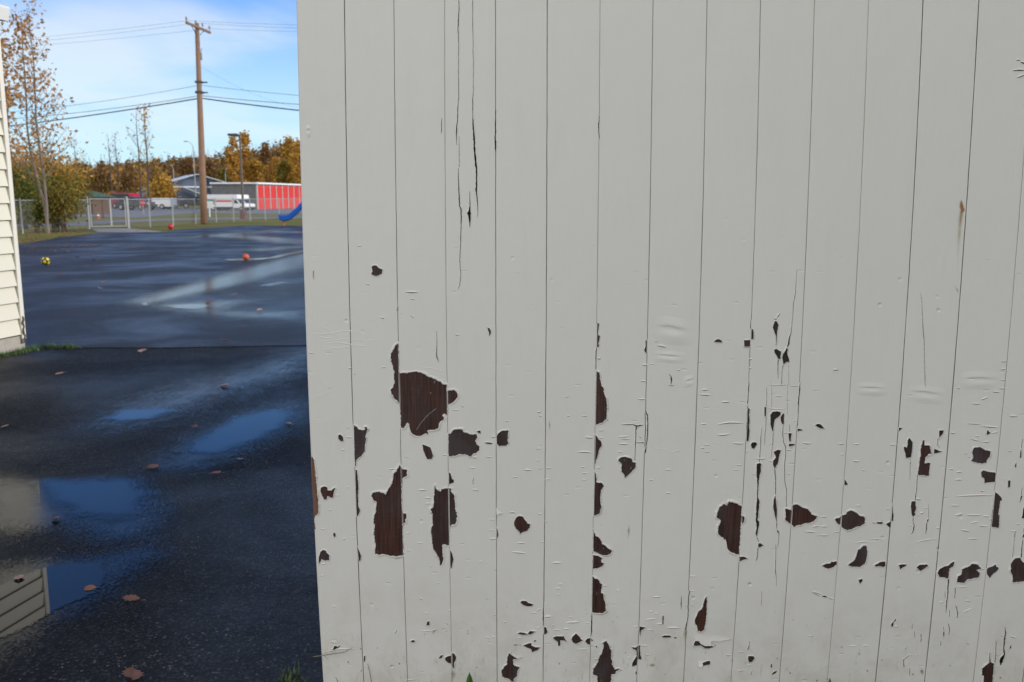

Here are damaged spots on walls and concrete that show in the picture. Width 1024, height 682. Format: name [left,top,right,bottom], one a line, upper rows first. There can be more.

crack [440,0,497,290]
peeling [388,341,510,460]
peeling [337,424,410,562]
peeling [428,471,460,569]
peeling [591,370,614,615]
peeling [617,455,637,479]
peeling [714,403,825,562]
peeling [833,502,894,532]
peeling [821,544,1024,584]
peeling [970,429,1024,538]
peeling [500,626,646,682]
peeling [693,595,731,668]